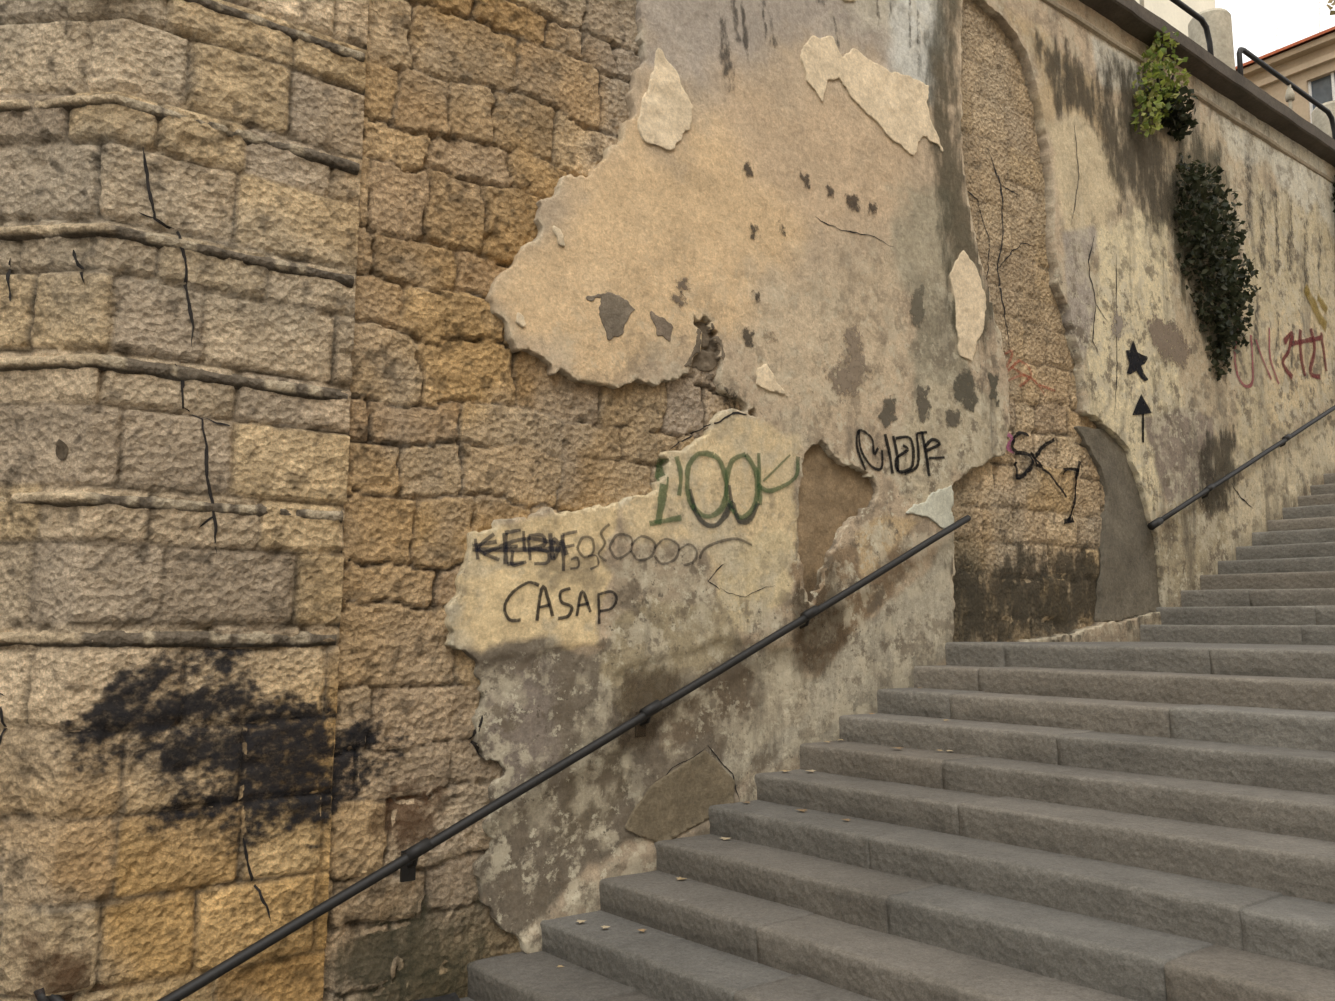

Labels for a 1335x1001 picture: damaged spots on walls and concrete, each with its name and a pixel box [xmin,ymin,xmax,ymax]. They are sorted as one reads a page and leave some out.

damp [720,0,748,81]
peeling [800,35,943,156]
flaking render [800,173,878,213]
crack [968,150,1034,361]
crack [139,148,230,553]
flaking render [878,394,898,428]
flaking render [906,0,1105,642]
flaking render [323,0,751,1001]
flaking render [797,444,873,590]
damp [951,541,1101,642]
crack [0,693,8,744]
crack [243,838,271,922]